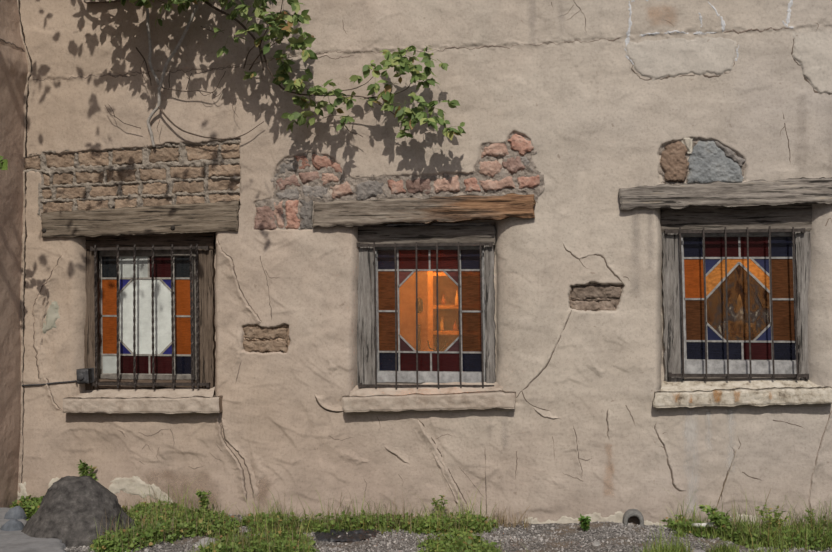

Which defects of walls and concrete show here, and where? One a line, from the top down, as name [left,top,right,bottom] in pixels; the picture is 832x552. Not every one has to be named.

crack [316,2,735,80]
crack [724,27,831,95]
flaking render [23,138,242,220]
flaking render [253,133,545,230]
flaking render [658,138,746,186]
crack [0,0,296,503]
flaking render [569,283,624,311]
flaking render [243,324,290,353]
crack [314,393,344,413]
crack [516,308,592,481]
crack [377,417,487,516]
crack [606,405,687,491]